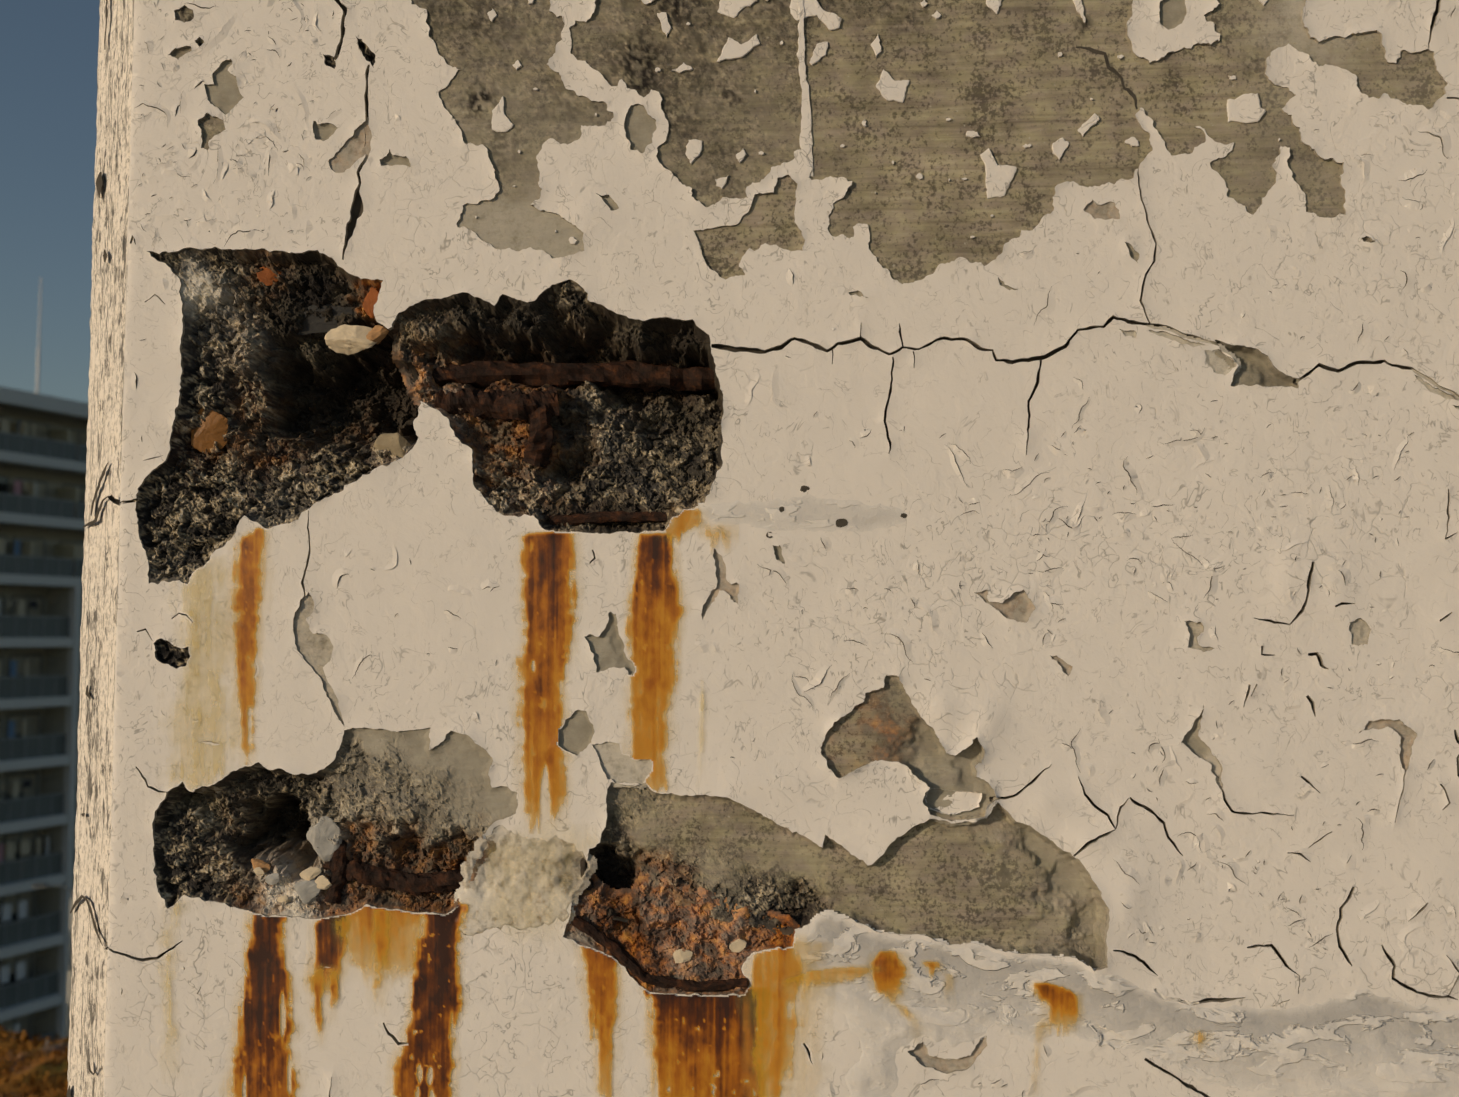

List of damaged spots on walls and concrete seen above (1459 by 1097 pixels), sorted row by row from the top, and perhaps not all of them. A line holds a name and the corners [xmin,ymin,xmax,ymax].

crack [333,0,369,247]
peeling [411,0,1446,290]
spalling [133,248,724,584]
crack [716,161,1223,454]
crack [1293,360,1411,385]
crack [70,895,182,961]
rust [232,528,264,756]
rust [231,903,468,1097]
rust [516,531,577,828]
spalling [154,590,1108,995]
rust [625,509,719,792]
rust [643,948,907,1097]